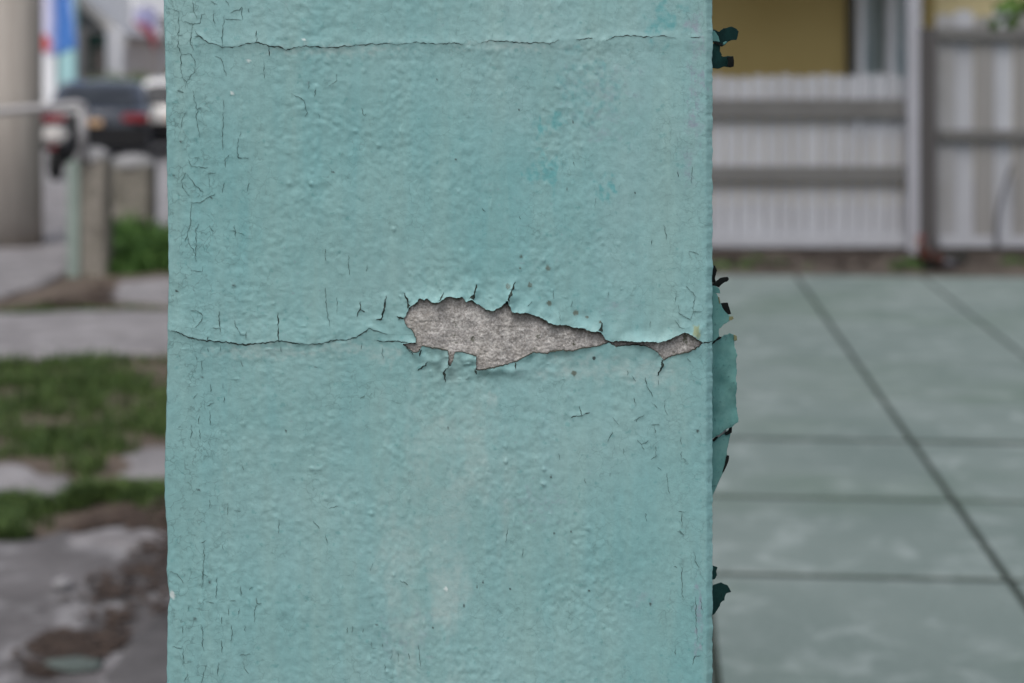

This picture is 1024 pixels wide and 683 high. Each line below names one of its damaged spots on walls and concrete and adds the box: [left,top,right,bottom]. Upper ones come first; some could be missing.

peeling [712,27,739,69]
crack [171,1,699,272]
crack [174,288,417,438]
peeling [397,265,739,494]
peeling [712,566,731,615]